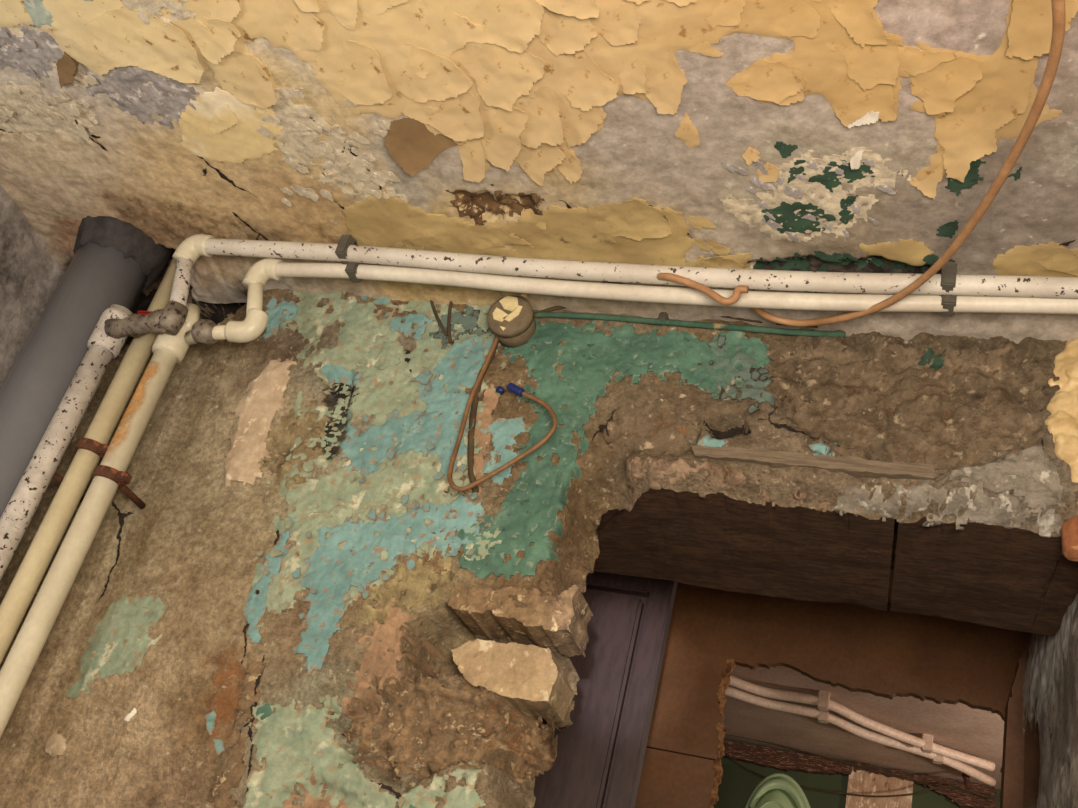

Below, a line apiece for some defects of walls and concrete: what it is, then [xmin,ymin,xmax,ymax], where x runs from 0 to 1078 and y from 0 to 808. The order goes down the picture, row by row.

peeling [1065,0,1078,32]
peeling [0,0,1062,274]
spalling [131,271,166,314]
hole [187,285,246,324]
peeling [992,241,1078,277]
rust [108,364,157,450]
spalling [205,289,1064,808]
peeling [65,583,169,699]